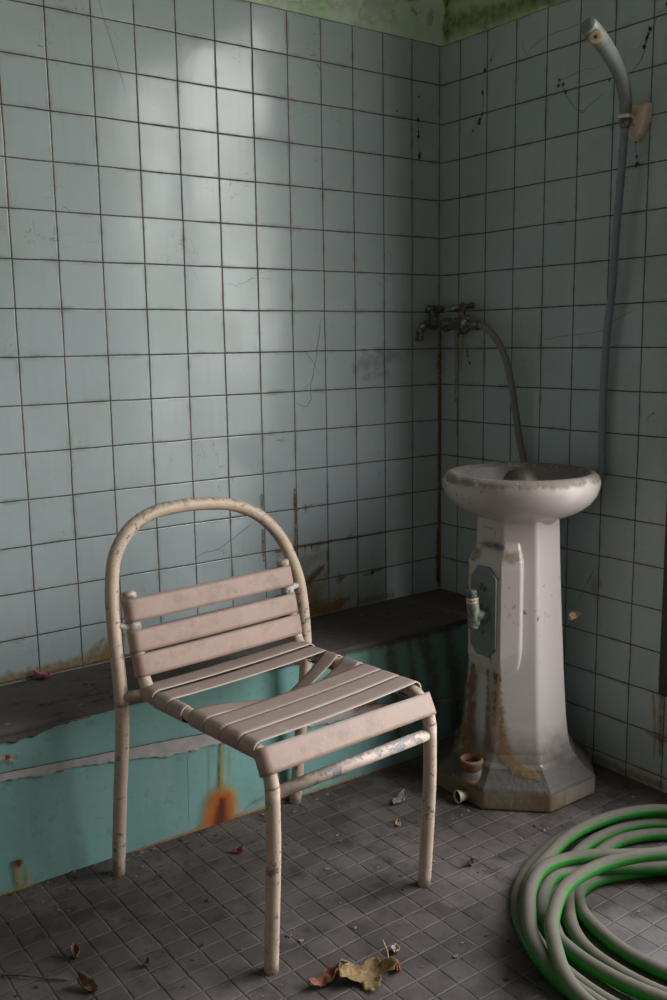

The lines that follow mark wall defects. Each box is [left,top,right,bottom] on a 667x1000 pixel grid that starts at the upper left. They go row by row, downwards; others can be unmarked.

corrosion [293,489,387,555]
peeling [0,716,91,744]
peeling [307,702,395,727]
corrosion [458,657,539,779]
peeling [129,733,222,759]
peeling [0,751,115,782]
corrosion [132,743,265,852]